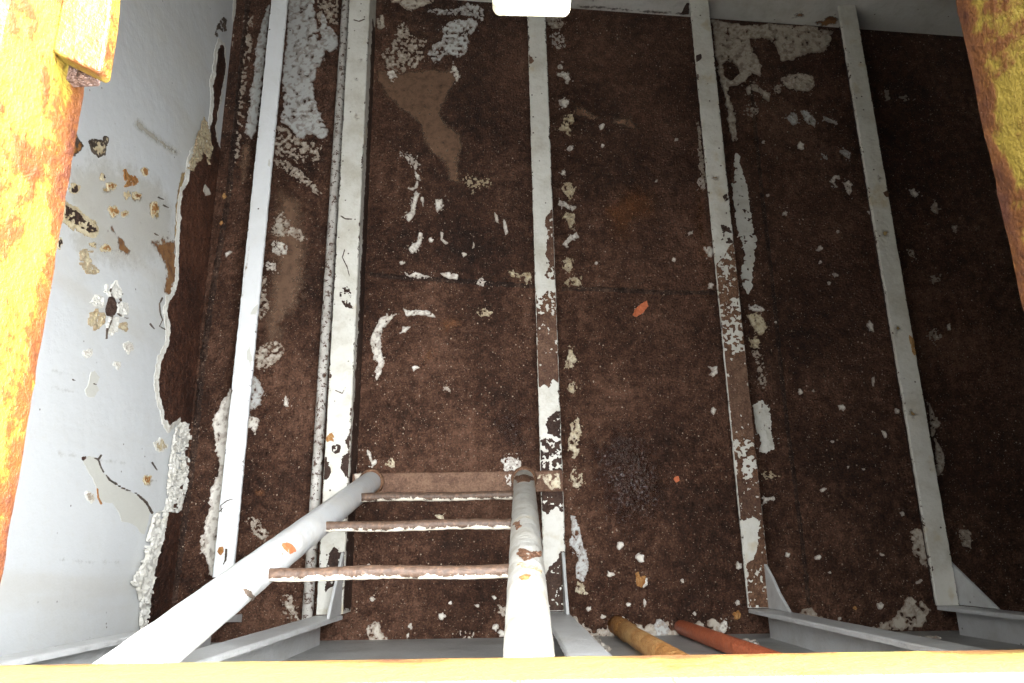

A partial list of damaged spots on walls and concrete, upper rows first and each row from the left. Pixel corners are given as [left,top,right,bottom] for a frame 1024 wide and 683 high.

peeling [381,22,440,63]
corrosion [73,134,84,156]
peeling [88,136,109,158]
peeling [268,125,323,174]
peeling [79,249,100,275]
peeling [752,333,768,391]
corrosion [542,492,563,514]
peeling [82,422,192,630]
corrosion [327,509,356,567]
corrosion [325,580,353,610]